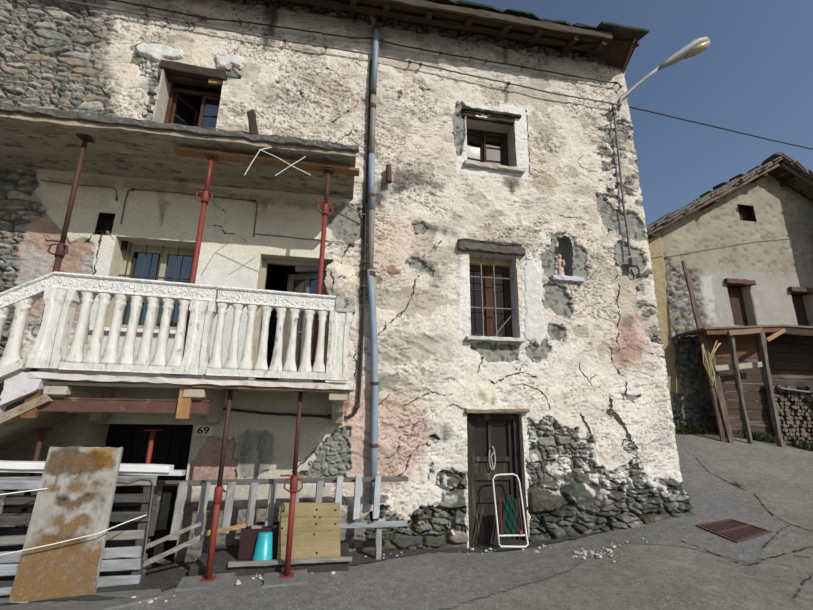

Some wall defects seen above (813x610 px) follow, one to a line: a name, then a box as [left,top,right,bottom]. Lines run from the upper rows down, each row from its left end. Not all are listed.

flaking render [130,43,184,121]
crack [83,230,114,275]
flaking render [327,203,363,248]
crack [377,239,443,336]
flaking render [470,233,592,363]
flaking render [597,195,646,279]
crack [478,358,551,410]
crack [579,270,639,449]
flaking render [297,426,351,488]
crack [378,378,467,476]
crack [580,412,592,460]
flaking render [526,416,695,542]